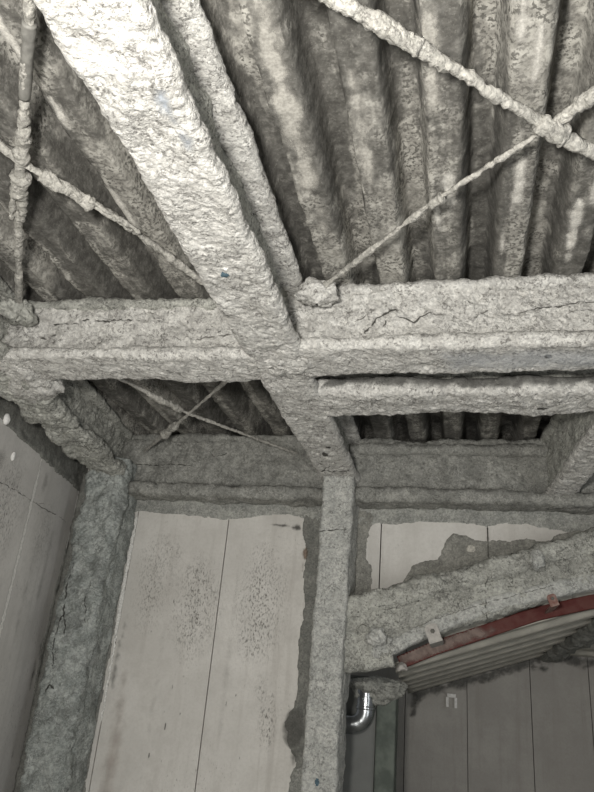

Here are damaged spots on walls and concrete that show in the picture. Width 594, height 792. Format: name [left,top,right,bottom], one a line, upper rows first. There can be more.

crack [355,309,431,333]
crack [52,564,91,664]
damp [284,712,302,744]